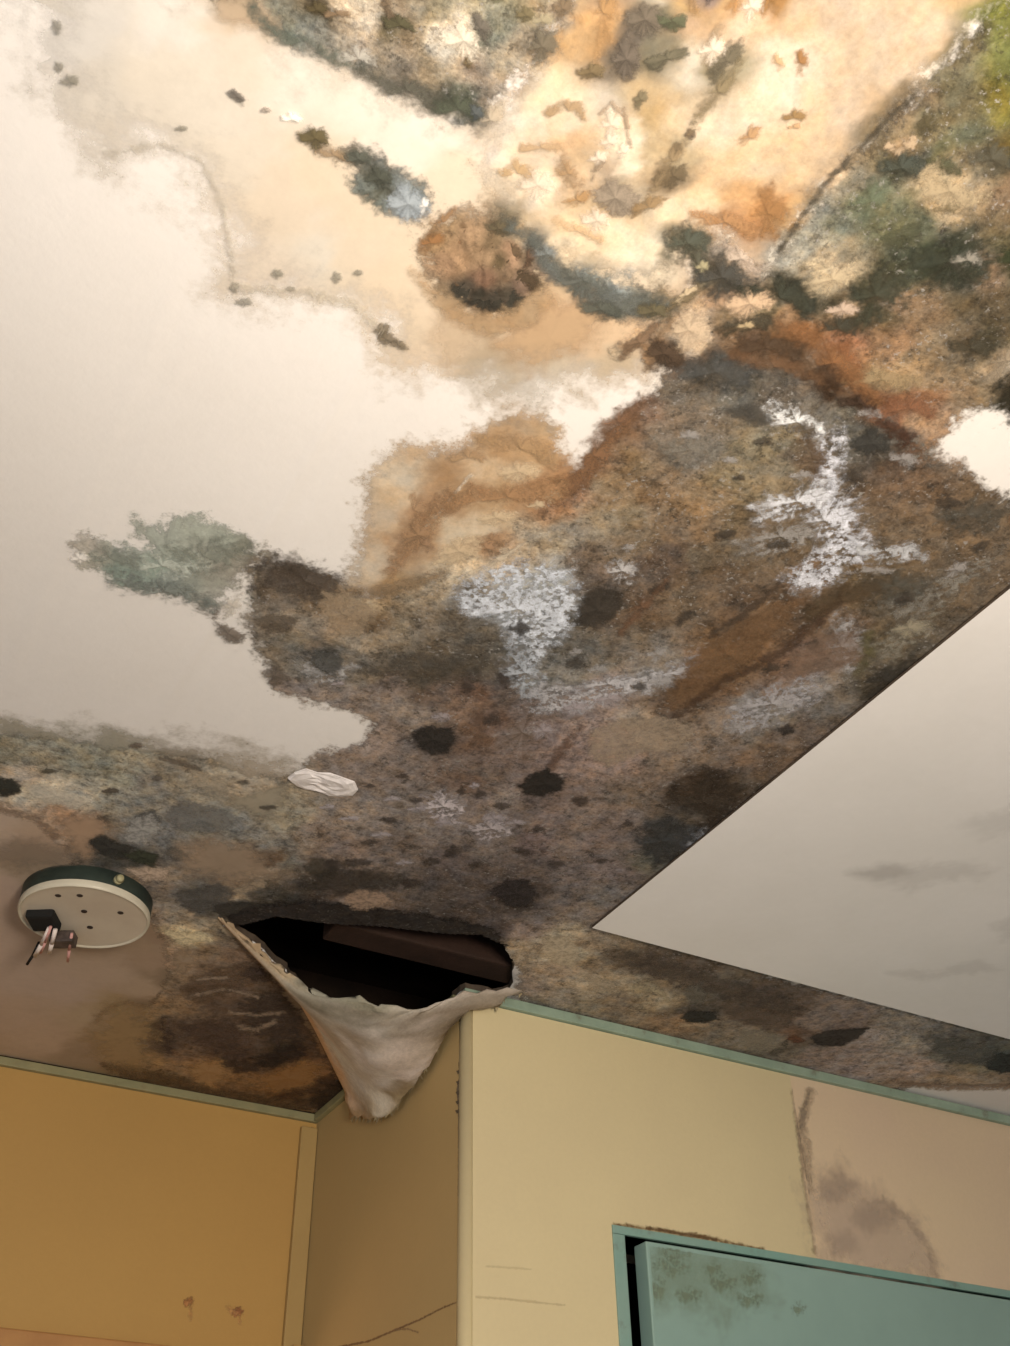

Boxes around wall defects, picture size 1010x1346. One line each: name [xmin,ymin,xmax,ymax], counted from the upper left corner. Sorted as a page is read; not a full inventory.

leakage [38,0,1010,450]
leakage [0,357,1010,1113]
crack [342,1302,457,1346]